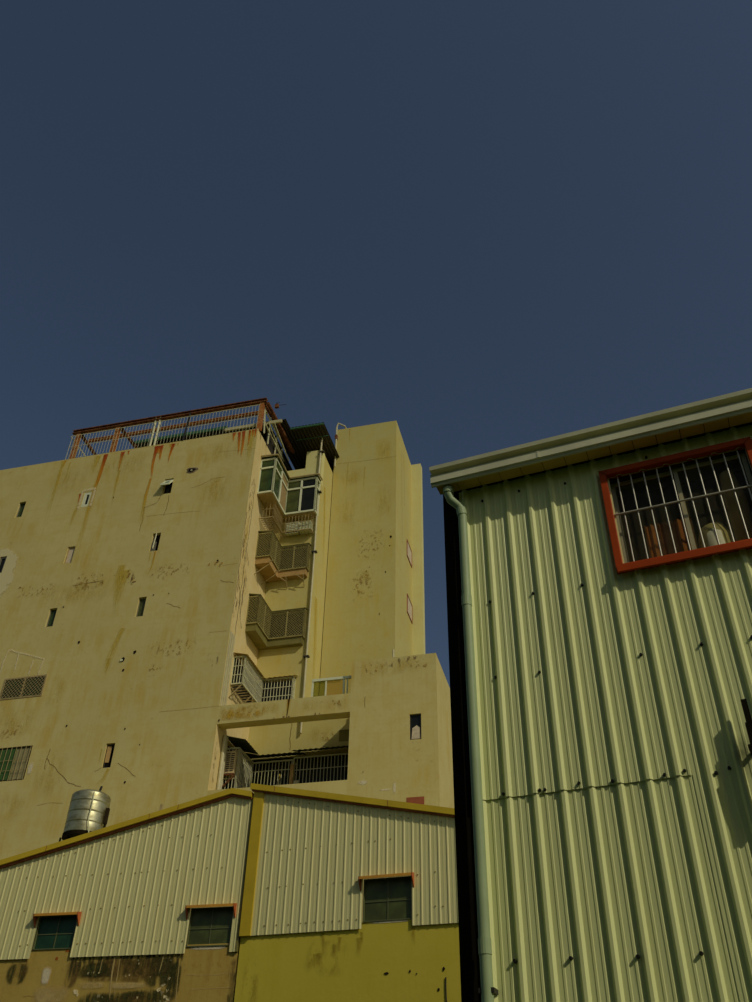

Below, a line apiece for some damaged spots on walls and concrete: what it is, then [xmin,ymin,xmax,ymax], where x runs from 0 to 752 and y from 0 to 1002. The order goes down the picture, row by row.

rust [74,454,108,520]
rust [143,443,175,510]
damp [69,953,184,1002]